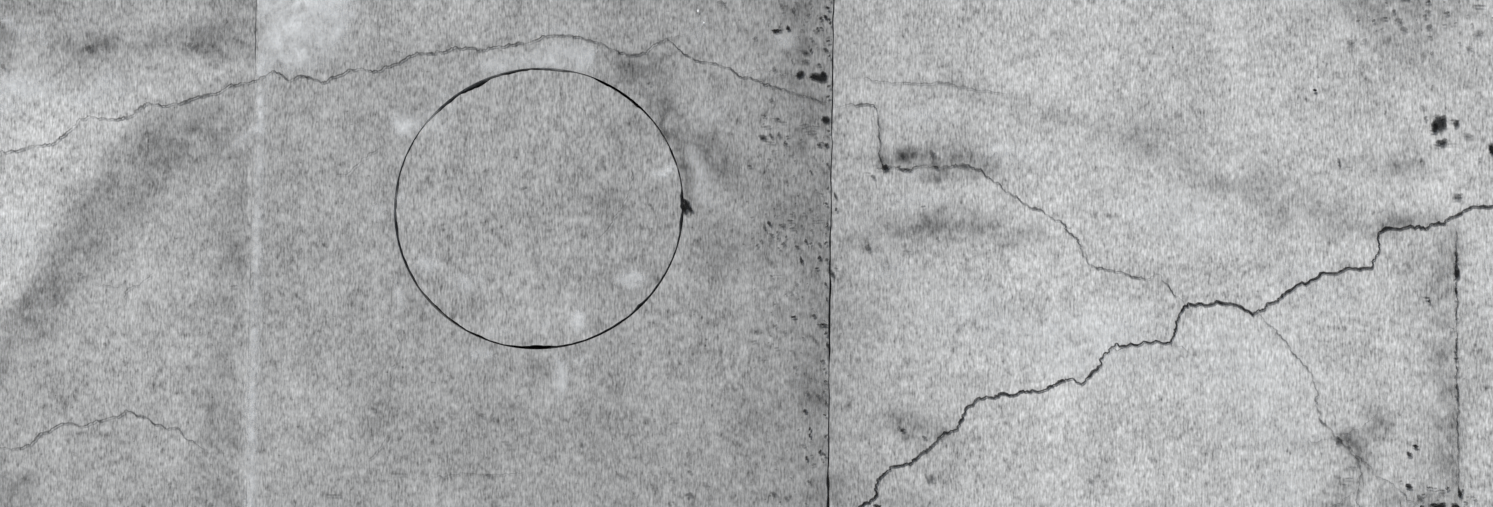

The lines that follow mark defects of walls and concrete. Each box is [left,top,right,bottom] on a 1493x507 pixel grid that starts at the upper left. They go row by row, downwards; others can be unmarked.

crack [10,34,780,152]
crack [815,99,1493,507]
crack [22,411,194,448]